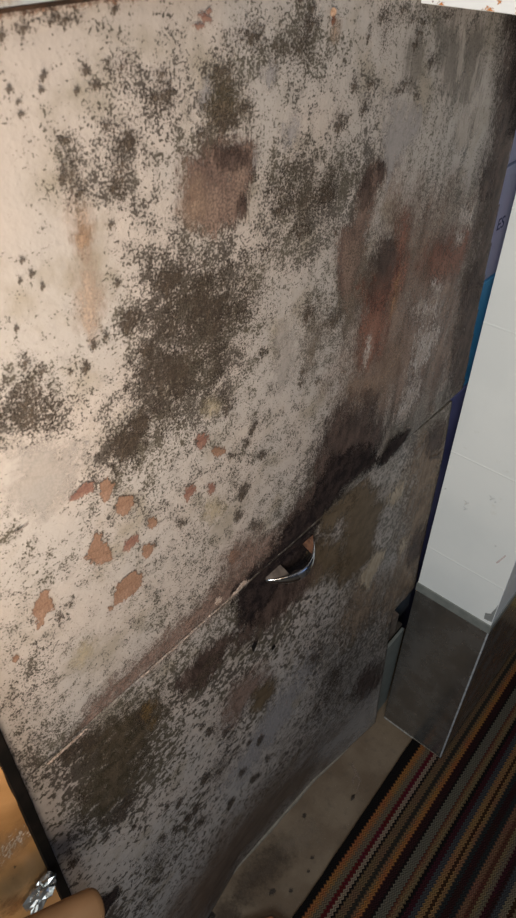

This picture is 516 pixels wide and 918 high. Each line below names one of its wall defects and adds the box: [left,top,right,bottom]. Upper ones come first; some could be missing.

corrosion [194,8,212,30]
damp [366,0,516,410]
damp [0,0,403,477]
peeling [196,433,226,458]
peeling [69,476,134,516]
peeling [184,482,215,503]
peeling [84,532,113,568]
peeling [122,534,155,559]
peeling [31,589,55,630]
peeling [108,571,143,611]
damp [50,387,447,918]